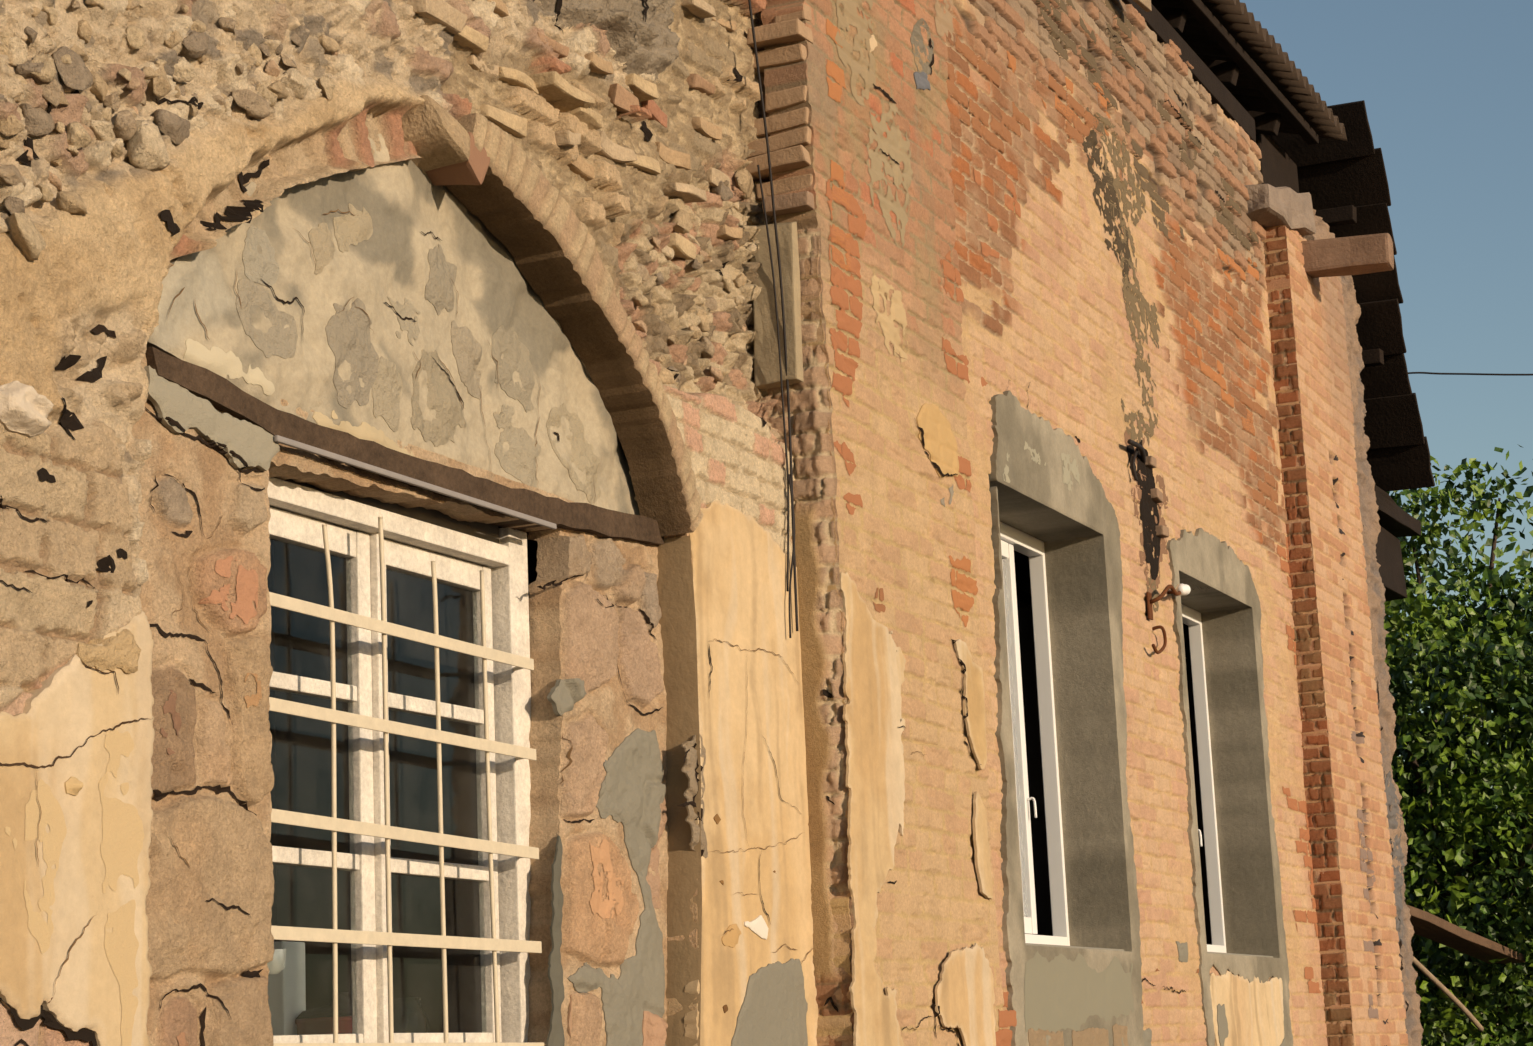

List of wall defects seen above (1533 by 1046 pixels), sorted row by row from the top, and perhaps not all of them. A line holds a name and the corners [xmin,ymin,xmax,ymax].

spalling [402,0,736,203]
spalling [235,225,298,359]
spalling [308,203,373,275]
flaking render [825,159,867,407]
spalling [325,244,601,504]
peeling [916,403,972,493]
peeling [76,629,141,674]
crack [0,660,153,866]
spalling [681,734,721,858]
peeling [721,915,768,948]
spalling [642,1011,668,1046]
spalling [995,992,1129,1046]